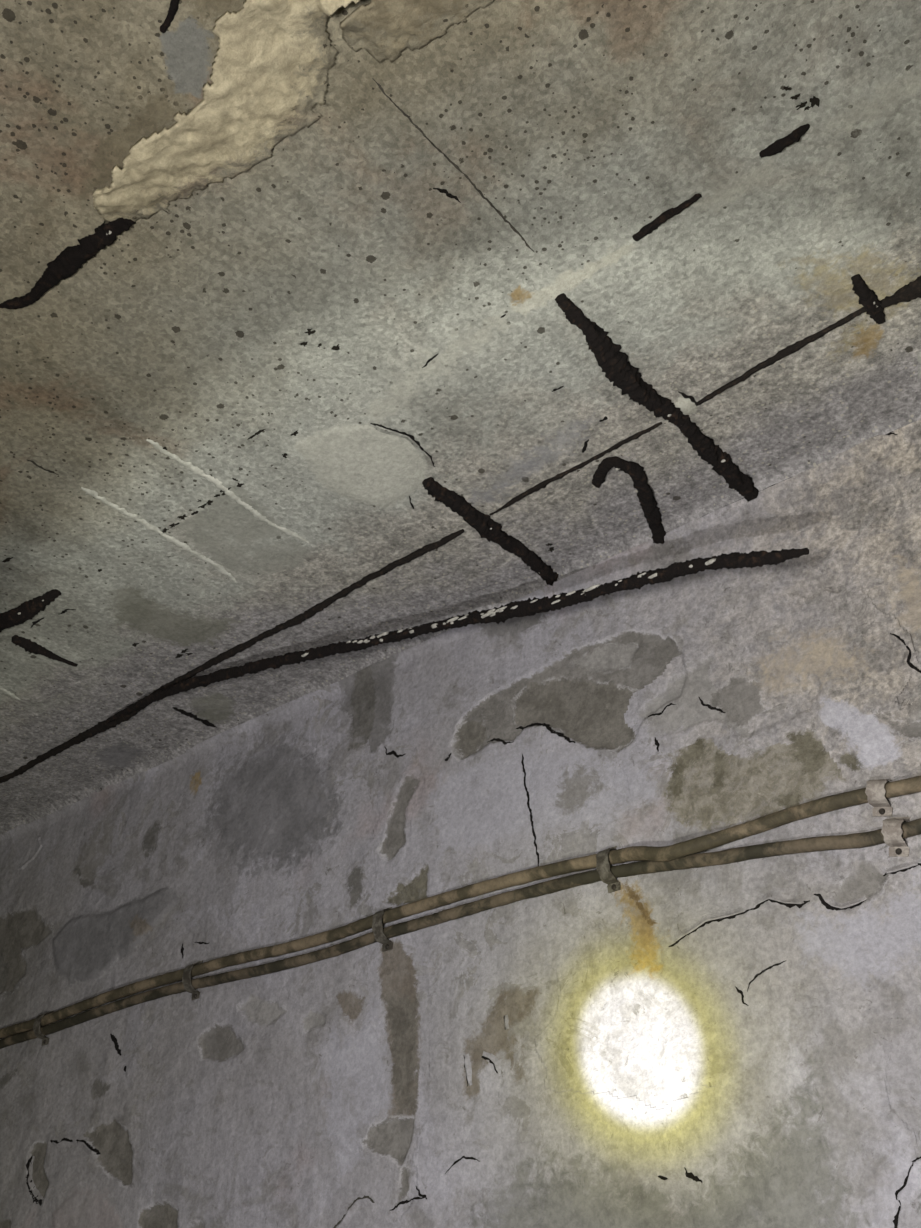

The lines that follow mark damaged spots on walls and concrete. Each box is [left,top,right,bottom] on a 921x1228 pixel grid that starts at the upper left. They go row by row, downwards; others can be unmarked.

spalling [326,0,371,49]
spalling [33,0,245,232]
crack [678,391,698,406]
crack [887,633,921,681]
crack [173,707,217,728]
crack [647,697,726,752]
crack [488,723,576,866]
crack [667,858,921,947]
rust [595,861,685,1000]
crack [333,1186,427,1228]
crack [445,1156,479,1174]
crack [893,1157,921,1228]